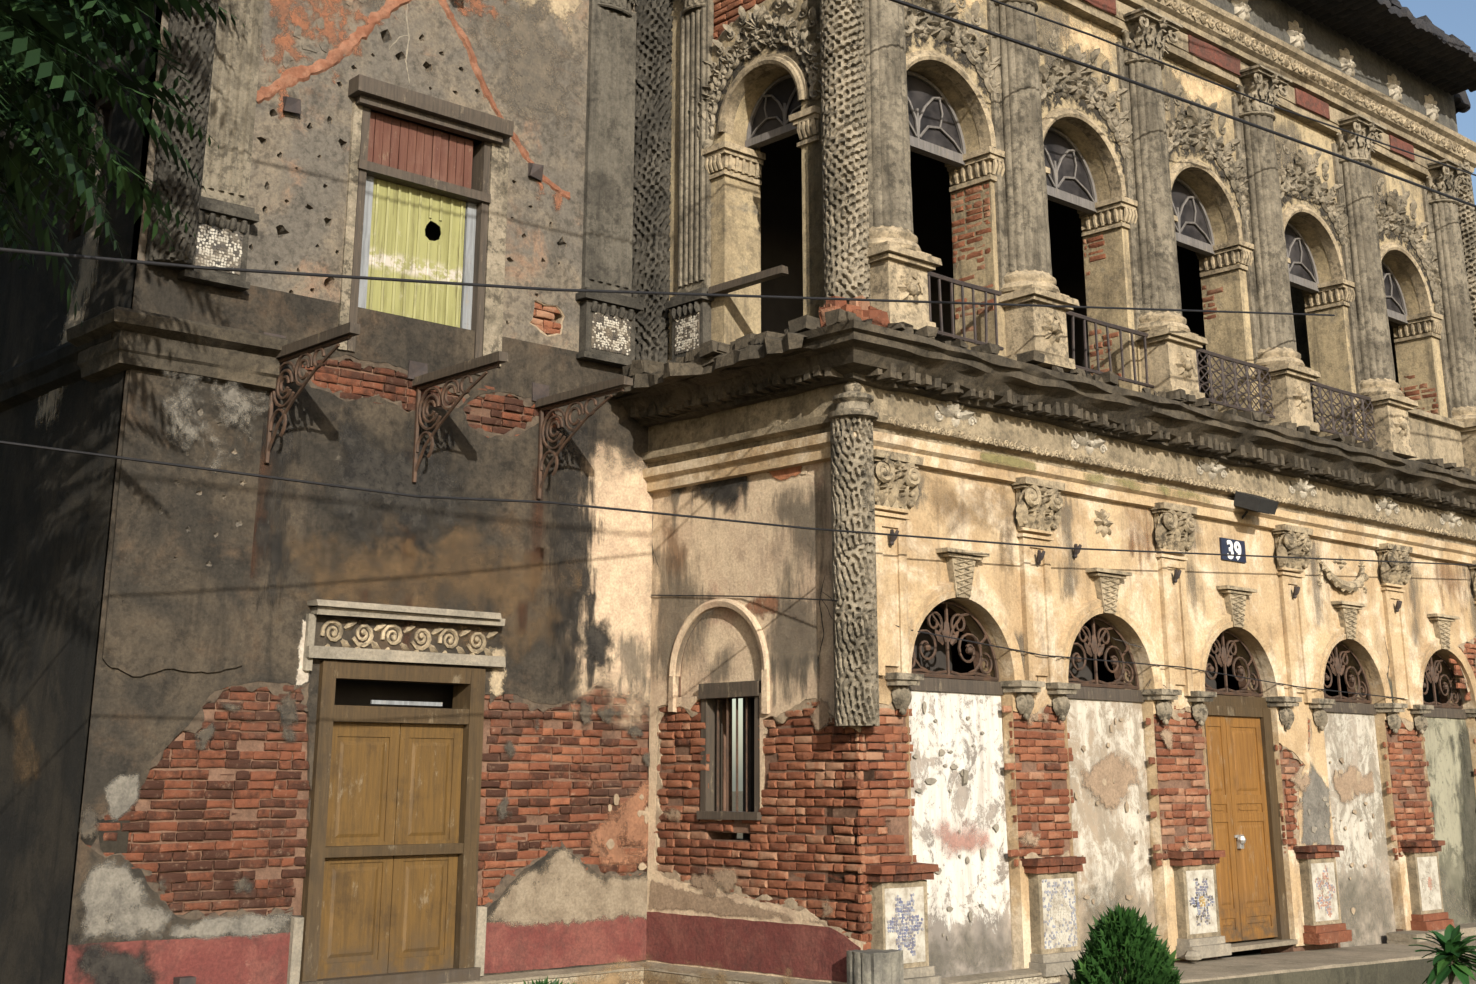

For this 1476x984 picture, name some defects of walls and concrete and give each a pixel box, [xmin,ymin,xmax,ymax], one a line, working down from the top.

flaking render [712,0,766,46]
flaking render [301,354,563,438]
water stain [255,402,301,609]
water stain [326,409,483,554]
water stain [671,476,748,530]
water stain [771,489,830,696]
water stain [711,651,729,683]
flaking render [1449,636,1476,721]
flaking render [79,681,310,919]
flaking render [478,679,969,950]
flaking render [940,704,1214,866]
flaking render [1275,717,1435,860]